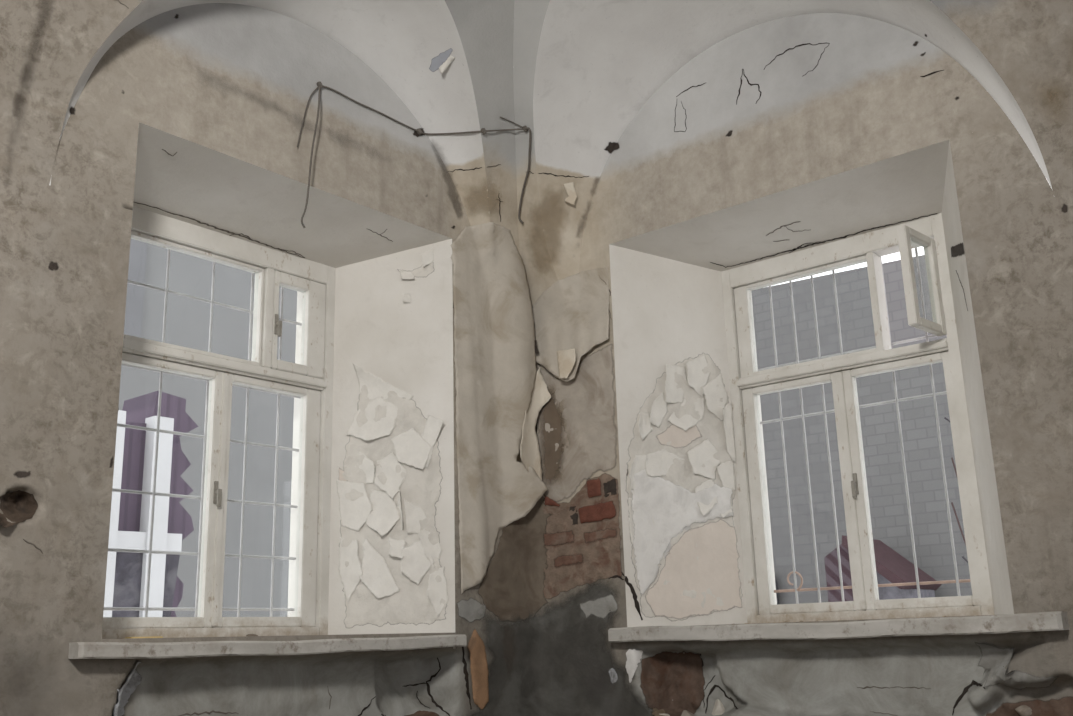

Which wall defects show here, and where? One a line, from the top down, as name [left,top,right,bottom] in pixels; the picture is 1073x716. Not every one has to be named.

spalling [0,471,38,528]
peeling [336,363,449,628]
peeling [478,344,742,622]
crack [608,572,643,620]
crack [179,708,239,716]
crack [404,658,450,716]
damp [457,583,654,716]
flaking render [626,649,705,716]
flaking render [976,643,1073,716]